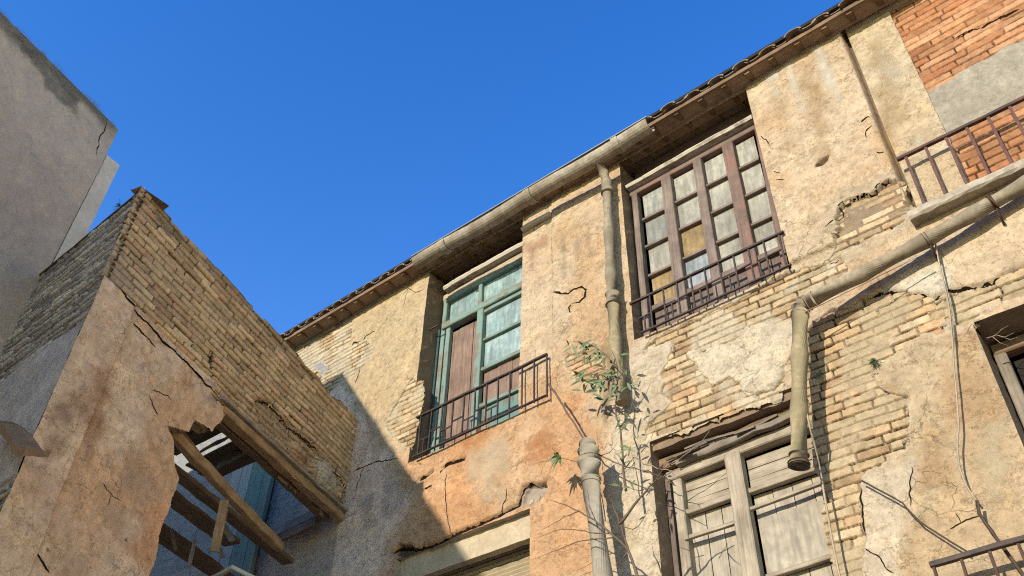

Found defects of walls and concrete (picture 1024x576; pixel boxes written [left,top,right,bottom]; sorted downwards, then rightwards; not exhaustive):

damp [19,36,46,62]
crack [115,284,219,398]
crack [552,286,587,317]
spalling [646,180,917,446]
crack [870,271,1016,302]
crack [253,400,316,451]
spalling [387,379,425,450]
crack [394,459,547,554]
crack [859,482,894,573]